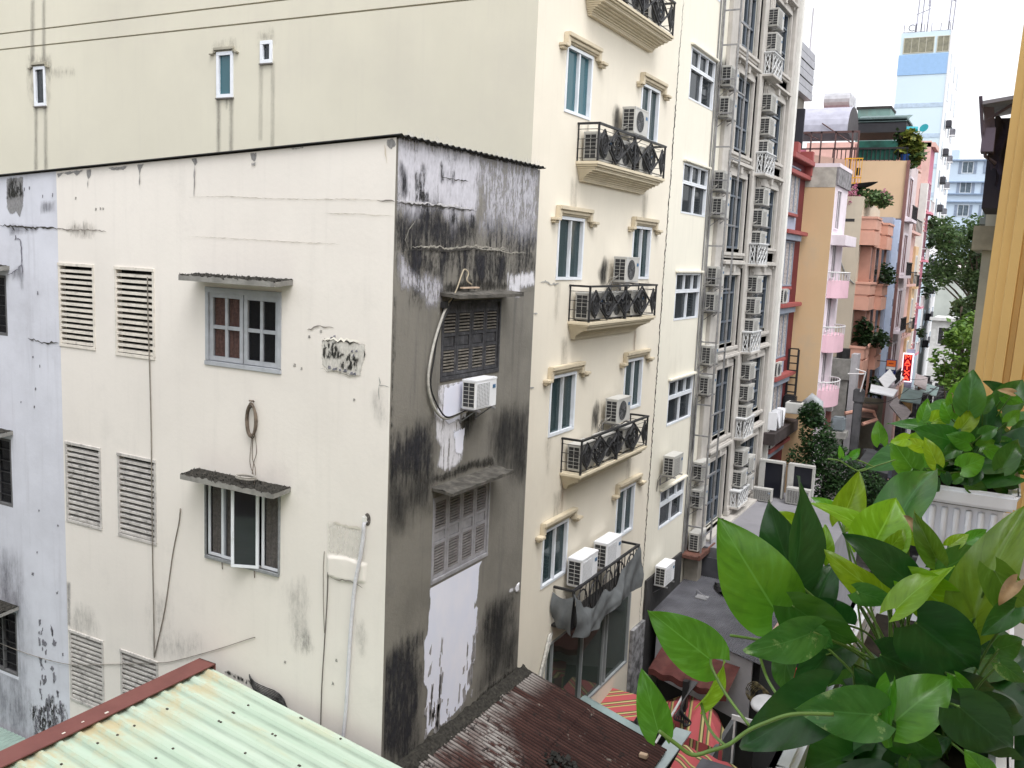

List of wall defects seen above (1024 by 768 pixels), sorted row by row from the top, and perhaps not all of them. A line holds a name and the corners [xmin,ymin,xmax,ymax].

peeling [7,177,30,216]
crack [204,196,525,254]
mould [396,165,536,297]
flaking render [308,330,365,377]
leakage [390,346,432,523]
peeling [443,381,466,454]
leakage [495,411,527,476]
peeling [424,561,482,739]
leakage [484,598,515,685]
leakage [384,635,423,761]